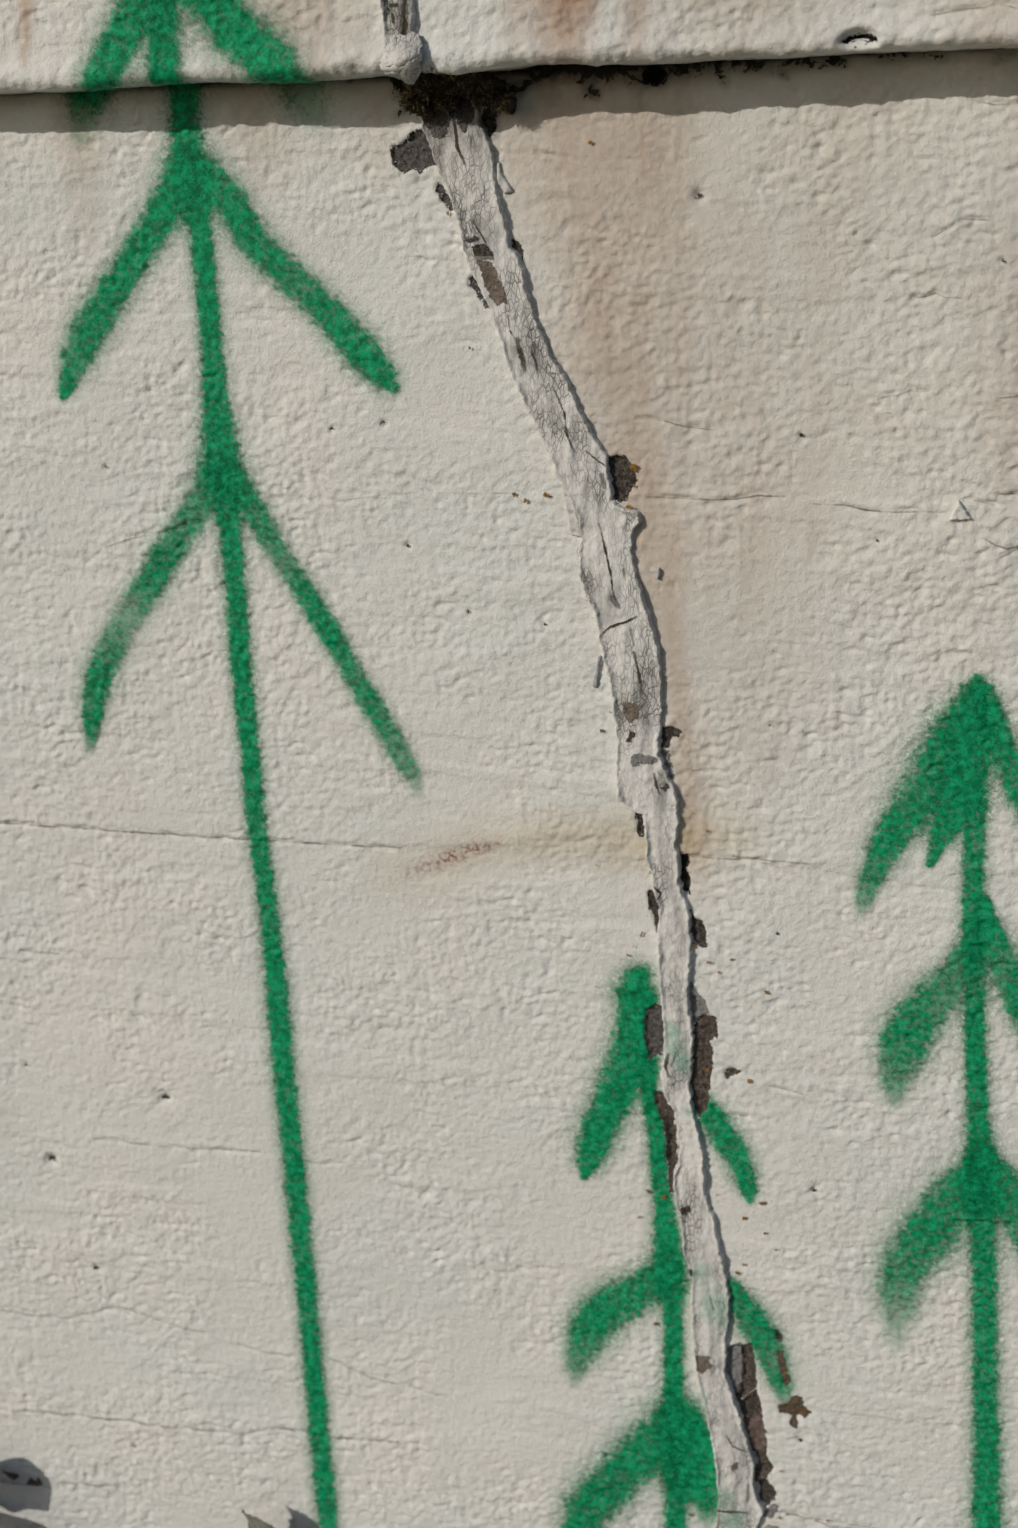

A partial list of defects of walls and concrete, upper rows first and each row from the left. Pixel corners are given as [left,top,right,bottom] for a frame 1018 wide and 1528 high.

spalling [389,128,436,175]
spalling [481,114,496,138]
spalling [435,183,453,211]
crack [379,0,766,1528]
spalling [661,726,682,780]
spalling [635,813,645,837]
spalling [647,890,660,932]
spalling [680,853,707,948]
spalling [643,1003,664,1060]
spalling [689,982,740,1117]
spalling [652,1091,680,1193]
spalling [725,1330,811,1528]